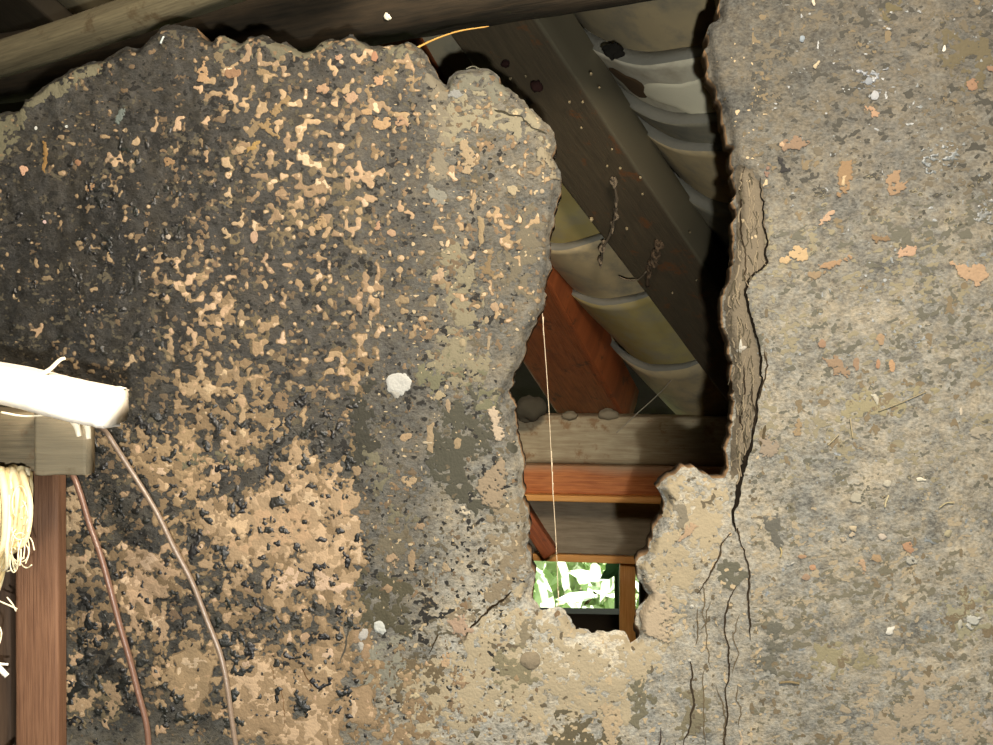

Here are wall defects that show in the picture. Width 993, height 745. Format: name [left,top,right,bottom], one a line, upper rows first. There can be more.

peeling [14,119,76,176]
peeling [51,341,114,378]
peeling [66,36,560,745]
water stain [344,377,386,486]
water stain [411,383,518,522]
crack [659,166,769,745]
water stain [356,566,419,639]
peeling [639,563,676,646]
water stain [491,619,551,695]
water stain [516,709,623,745]
peeling [584,694,629,745]
water stain [627,670,657,729]